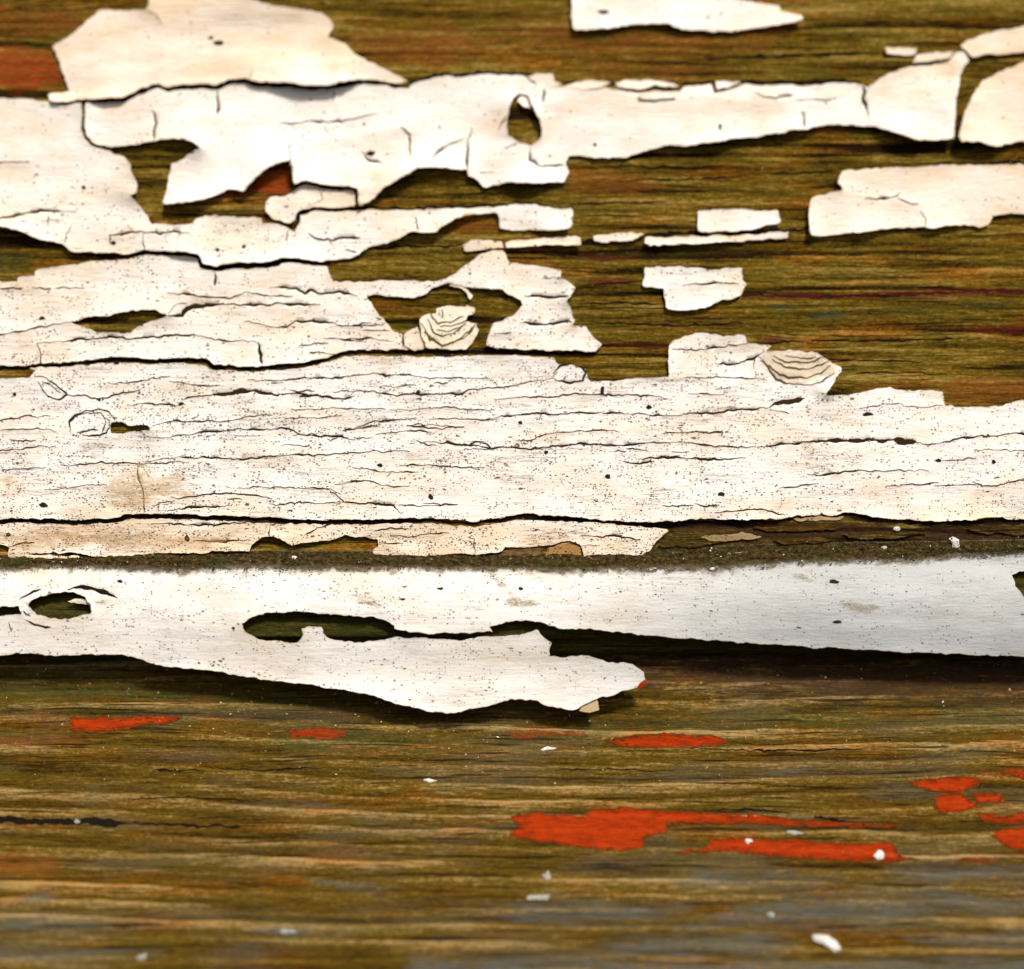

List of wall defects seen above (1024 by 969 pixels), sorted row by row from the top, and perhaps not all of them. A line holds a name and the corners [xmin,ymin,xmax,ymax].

crack [0,40,53,48]
crack [0,2,162,23]
crack [682,51,885,127]
crack [0,70,1024,556]
peeling [0,0,1024,714]
peeling [973,792,1005,804]